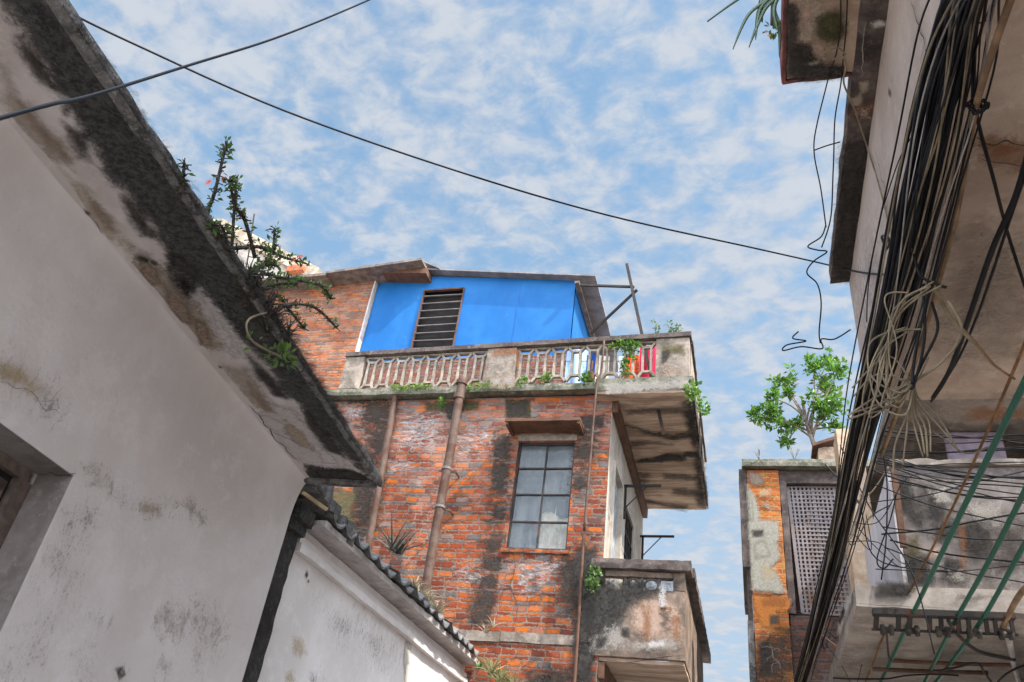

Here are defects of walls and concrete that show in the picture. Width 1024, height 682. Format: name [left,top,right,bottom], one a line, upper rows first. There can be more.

damp [784,3,845,82]
damp [2,0,392,537]
damp [466,399,531,629]
damp [625,400,707,511]
peeling [747,472,785,593]
damp [876,474,1024,596]
damp [522,544,673,682]